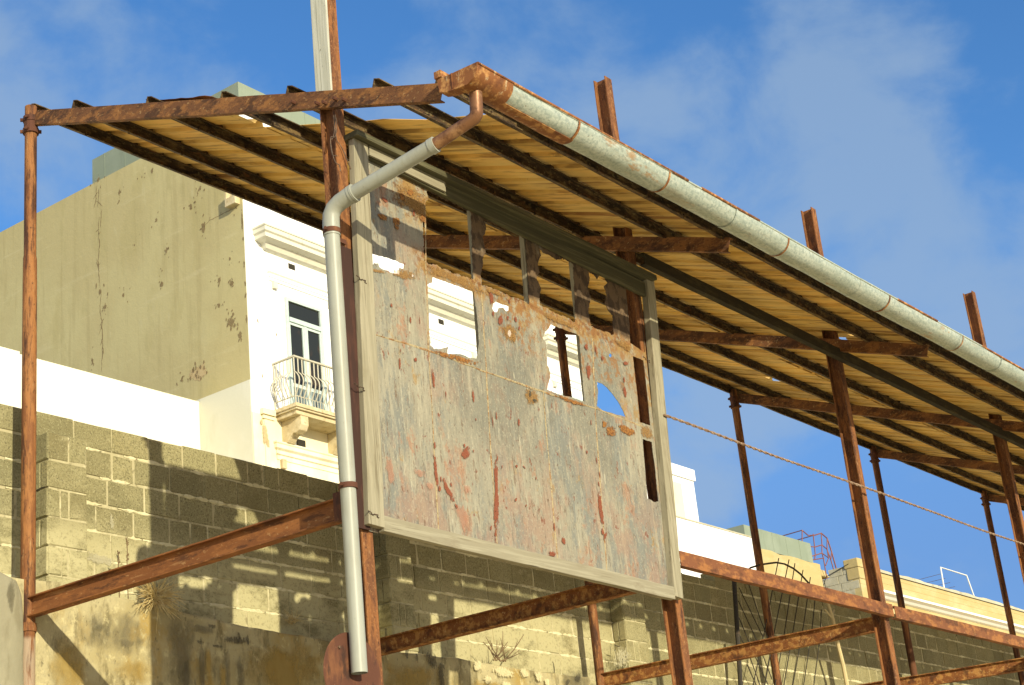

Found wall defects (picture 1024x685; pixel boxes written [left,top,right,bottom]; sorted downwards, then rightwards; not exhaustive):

crack [93,185,104,372]
rust [423,261,505,296]
rust [434,350,478,365]
rust [526,388,538,404]
rust [603,421,653,439]
peeling [434,442,458,508]
peeling [490,455,503,539]
peeling [586,450,608,540]